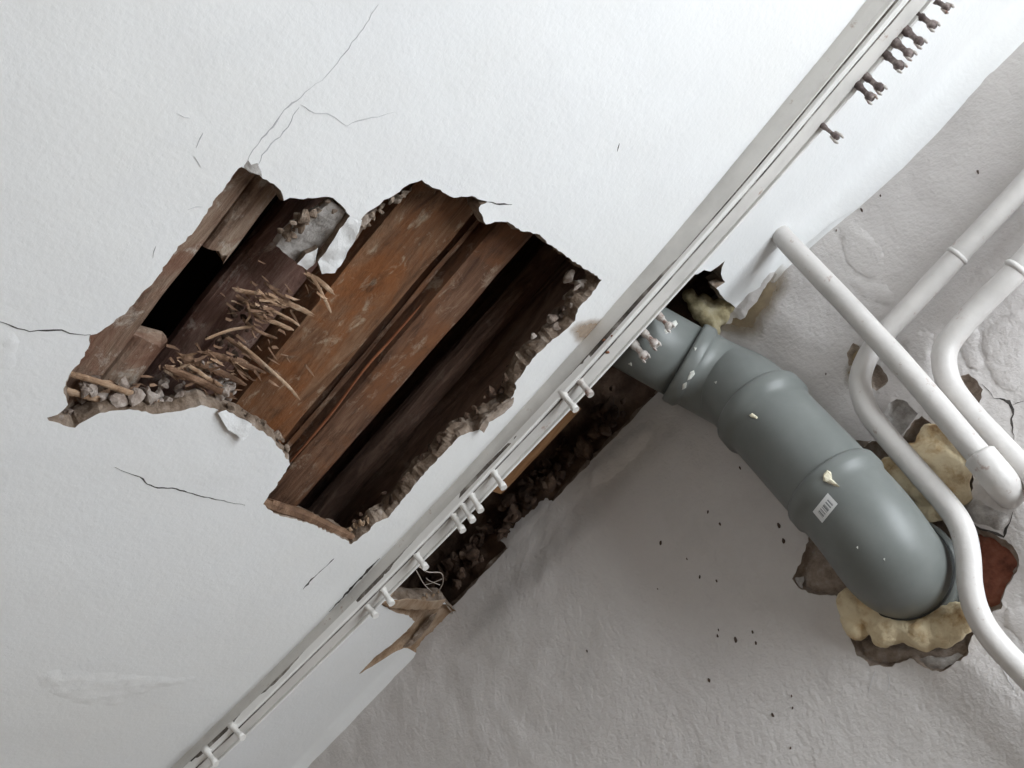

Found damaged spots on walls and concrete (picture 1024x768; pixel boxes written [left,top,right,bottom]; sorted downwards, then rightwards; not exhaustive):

crack [247,5,393,177]
crack [2,322,91,335]
spalling [872,364,888,391]
peeling [903,330,935,383]
peeling [961,309,1024,403]
flaking render [217,408,252,441]
spalling [884,399,931,443]
spalling [856,440,889,460]
crack [117,468,243,505]
spalling [792,537,847,596]
spalling [964,476,1024,643]
spalling [851,632,974,672]